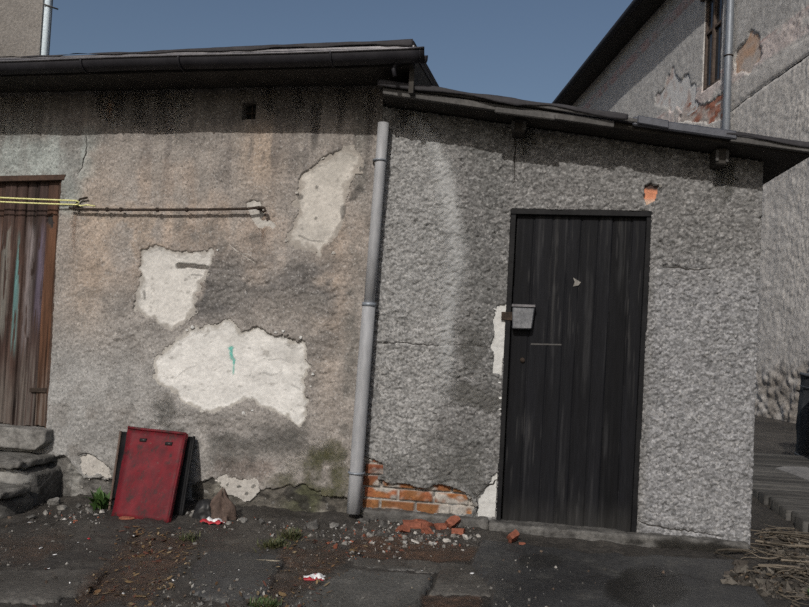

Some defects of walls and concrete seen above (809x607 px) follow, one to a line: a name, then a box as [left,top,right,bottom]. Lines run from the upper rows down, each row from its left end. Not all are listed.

peeling [656,67,723,124]
crack [730,55,809,112]
peeling [285,145,364,257]
flaking render [644,184,662,205]
peeling [133,245,314,428]
peeling [491,304,506,383]
flaking render [53,454,112,496]
flaking render [191,474,347,513]
flaking render [362,457,497,517]